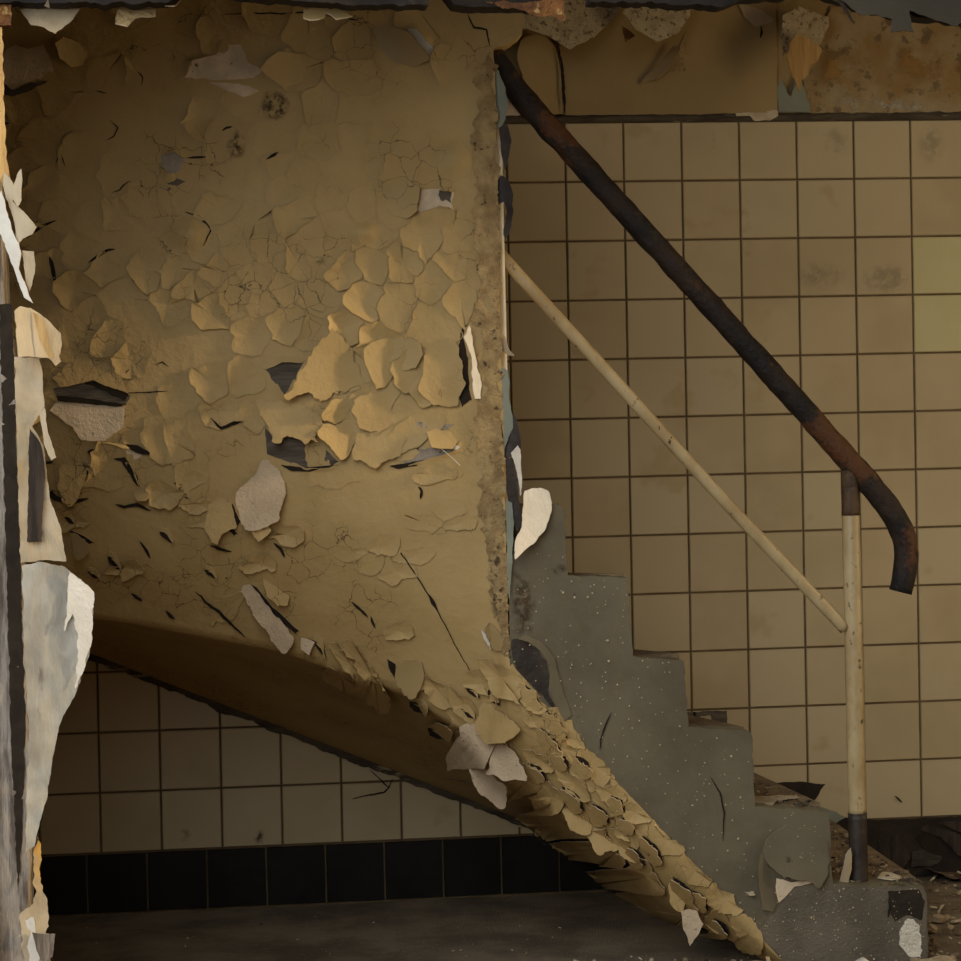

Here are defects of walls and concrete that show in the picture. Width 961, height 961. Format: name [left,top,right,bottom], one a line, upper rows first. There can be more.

peeling [506,98,520,116]
peeling [0,0,514,961]
peeling [511,446,522,496]
peeling [420,635,928,961]